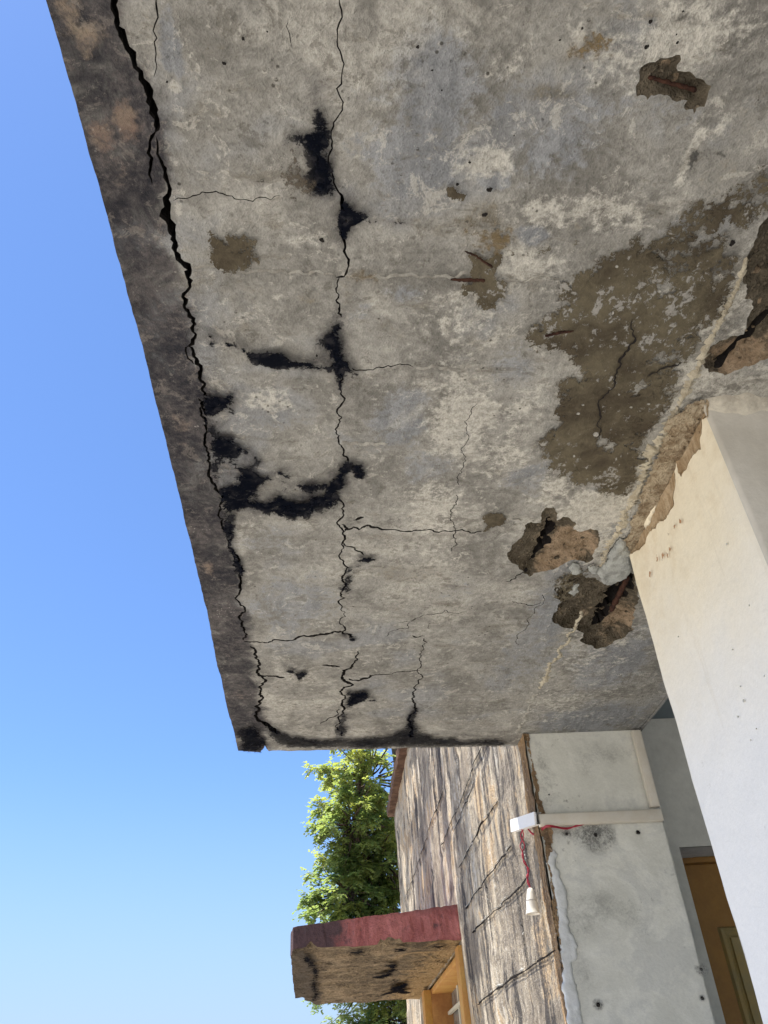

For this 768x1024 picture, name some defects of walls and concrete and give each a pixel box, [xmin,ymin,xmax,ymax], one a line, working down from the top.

spalling [636,55,711,113]
leakage [280,109,377,240]
peeling [450,244,552,311]
leakage [209,320,358,391]
crack [110,0,481,733]
peeling [524,163,768,554]
leakage [203,393,366,578]
spalling [482,507,640,649]